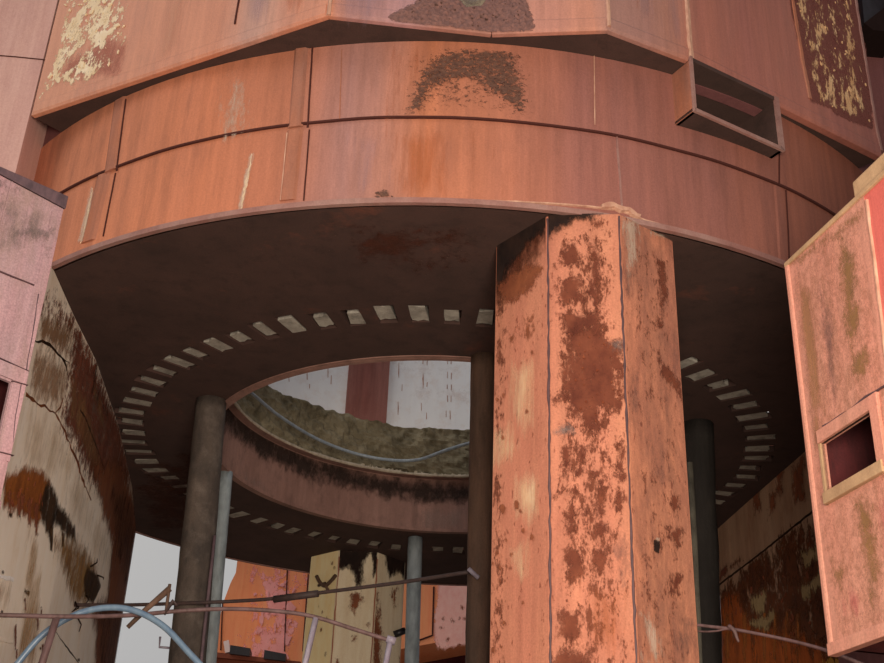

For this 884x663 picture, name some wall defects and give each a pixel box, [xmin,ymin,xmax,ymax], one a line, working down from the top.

peeling [39,0,127,98]
peeling [797,0,867,116]
rust [496,263,542,316]
rust [637,250,668,340]
crack [35,340,68,377]
crack [25,392,105,500]
rust [31,291,136,663]
rust [552,220,628,663]
rust [3,467,51,661]
peeling [239,564,309,659]
rust [665,573,684,606]
rust [719,519,838,663]